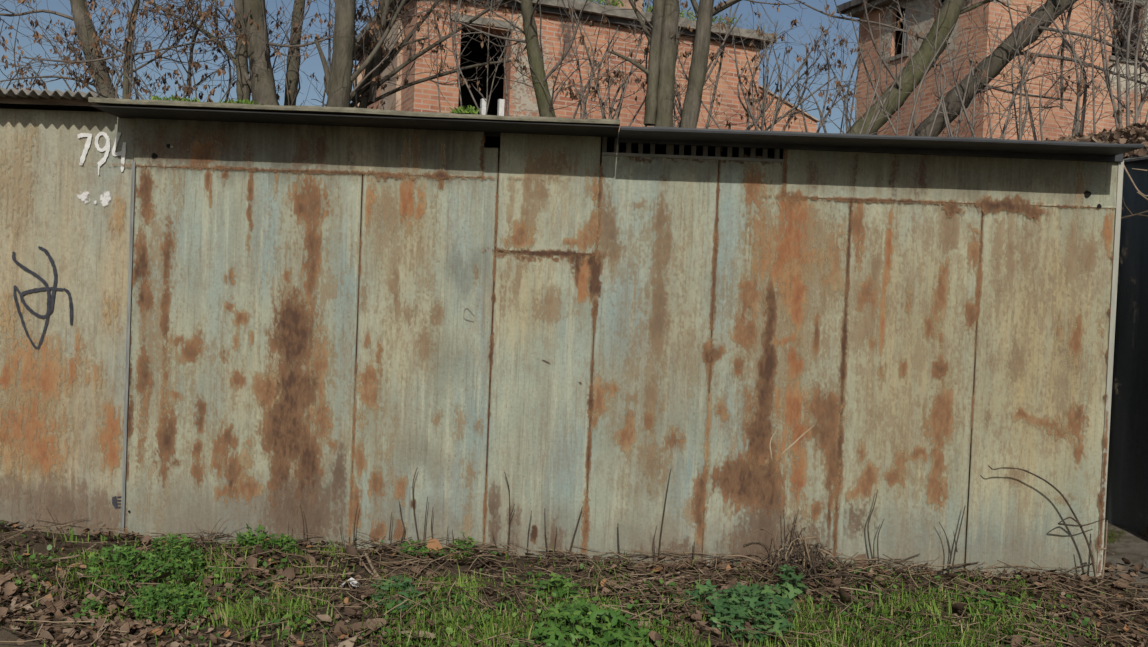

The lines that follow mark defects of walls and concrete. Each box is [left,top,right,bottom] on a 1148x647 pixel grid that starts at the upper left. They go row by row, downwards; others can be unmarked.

corrosion [0,127,494,546]
corrosion [462,460,563,558]
corrosion [485,146,1122,572]